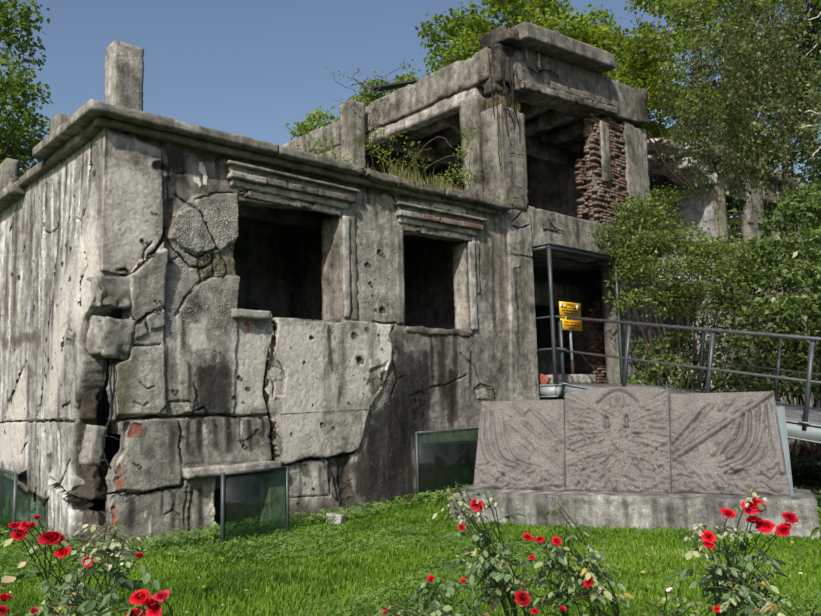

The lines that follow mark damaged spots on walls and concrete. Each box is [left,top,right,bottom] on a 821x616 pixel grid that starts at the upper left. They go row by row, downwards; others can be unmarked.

crack [30,161,370,515]
water stain [186,349,252,453]
water stain [354,331,457,510]